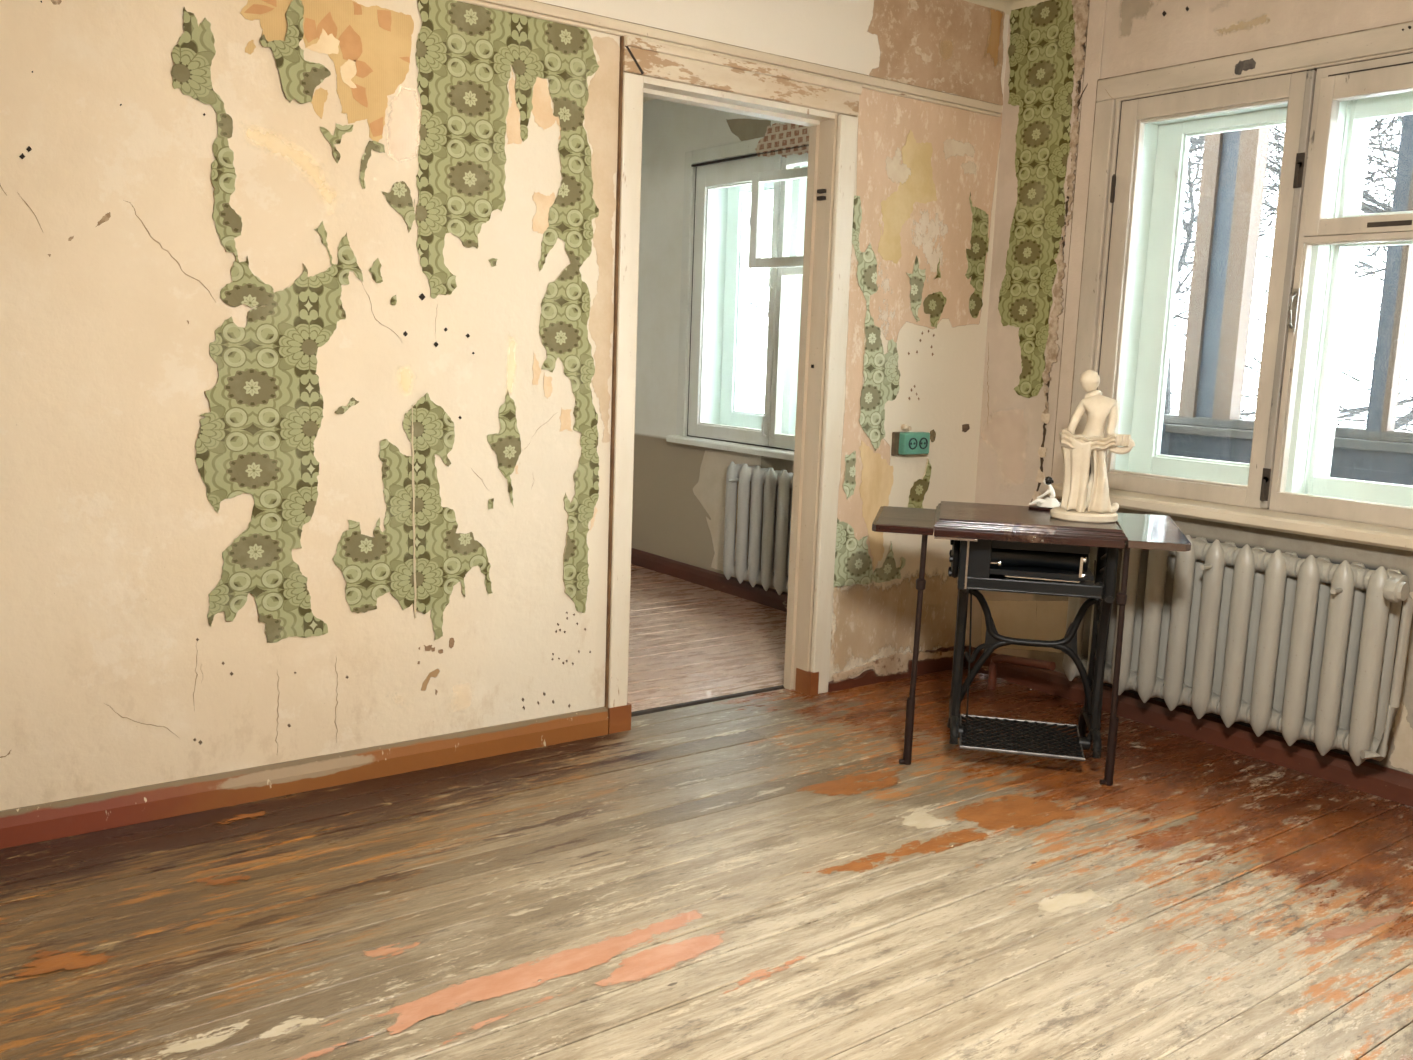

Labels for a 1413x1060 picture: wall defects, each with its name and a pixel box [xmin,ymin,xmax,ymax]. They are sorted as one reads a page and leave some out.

flaking render [726,119,771,141]
peeling [1041,0,1089,424]
crack [123,200,216,302]
flaking render [837,0,1005,570]
peeling [417,638,455,664]
spalling [833,651,954,682]
flaking render [981,600,1068,653]